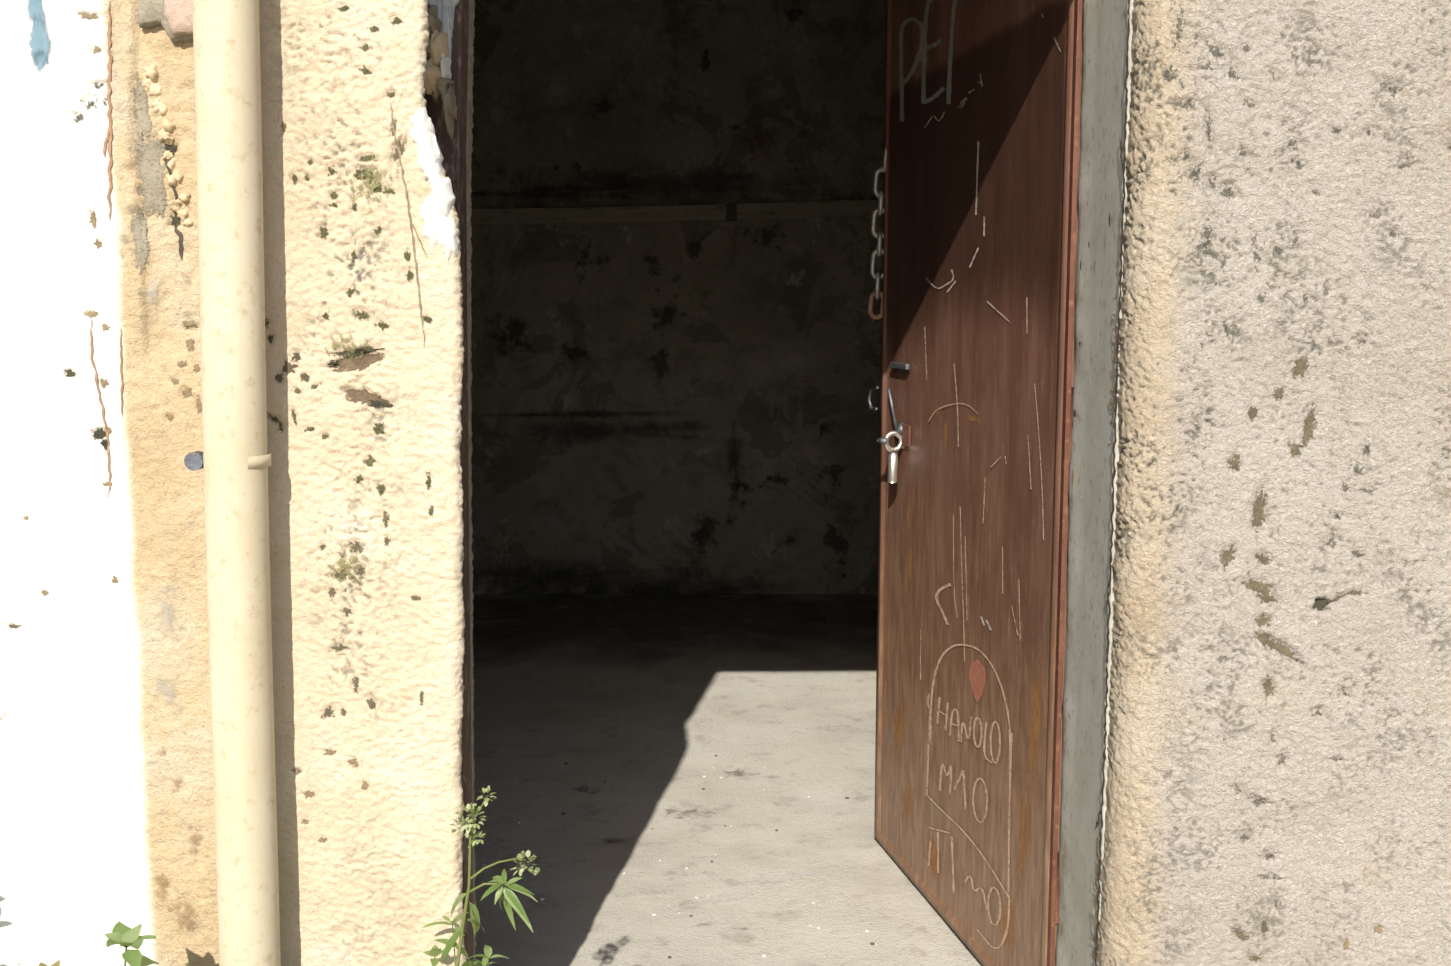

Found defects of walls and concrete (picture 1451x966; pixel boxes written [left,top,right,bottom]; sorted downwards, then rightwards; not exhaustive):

flaking render [138,0,193,42]
crack [165,158,183,260]